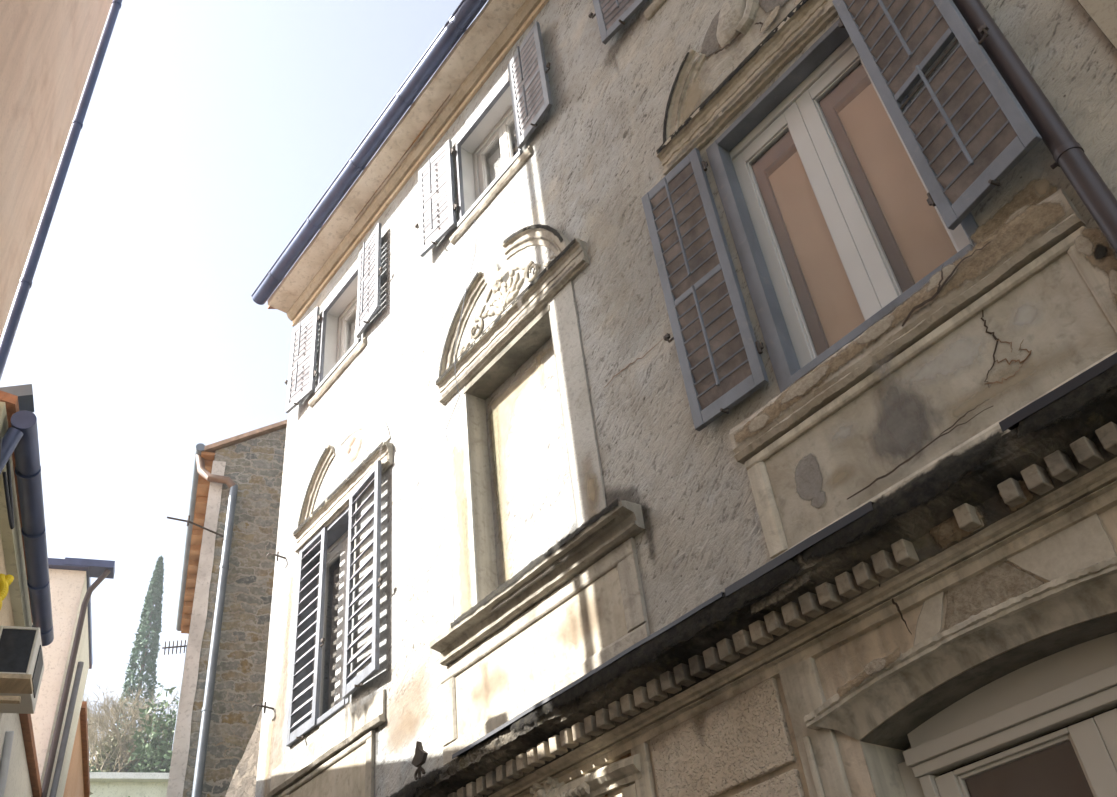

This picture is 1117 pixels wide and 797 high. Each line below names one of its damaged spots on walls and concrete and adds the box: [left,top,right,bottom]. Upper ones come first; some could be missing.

leakage [874,361,929,459]
crack [847,310,1032,500]